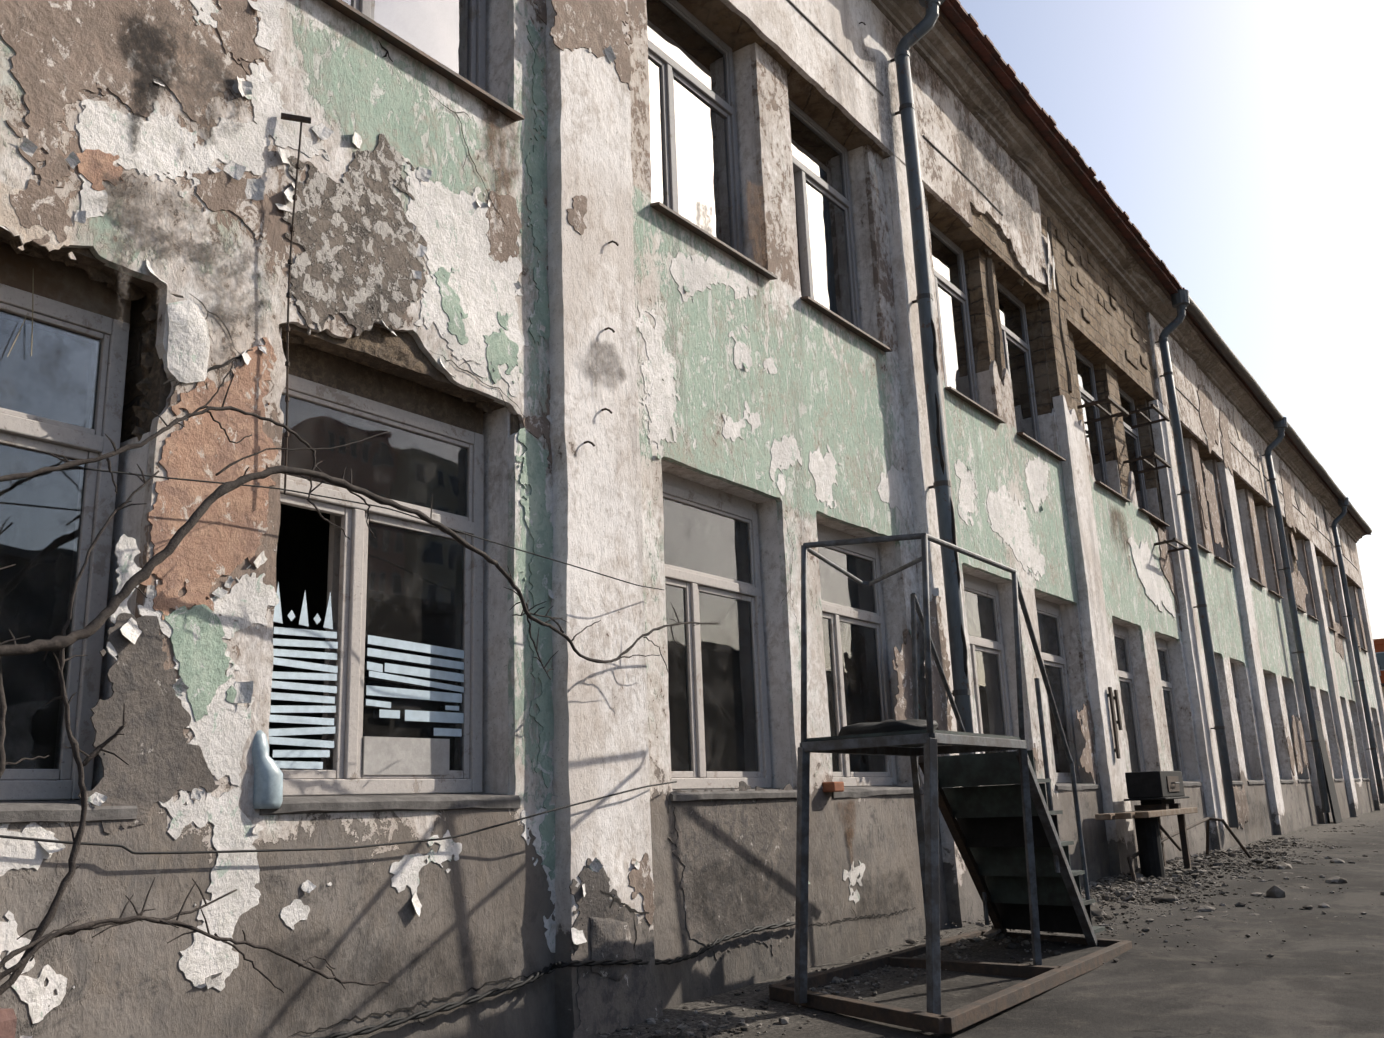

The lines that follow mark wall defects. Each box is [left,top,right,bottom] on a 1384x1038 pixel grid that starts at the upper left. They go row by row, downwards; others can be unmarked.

mould [121,17,244,149]
peeling [533,0,634,91]
peeling [669,252,757,302]
peeling [728,325,778,374]
peeling [0,0,552,991]
peeling [722,401,761,442]
peeling [769,435,841,509]
peeling [954,454,1050,581]
peeling [1127,524,1182,632]
peeling [892,588,953,756]
peeling [0,910,75,1038]